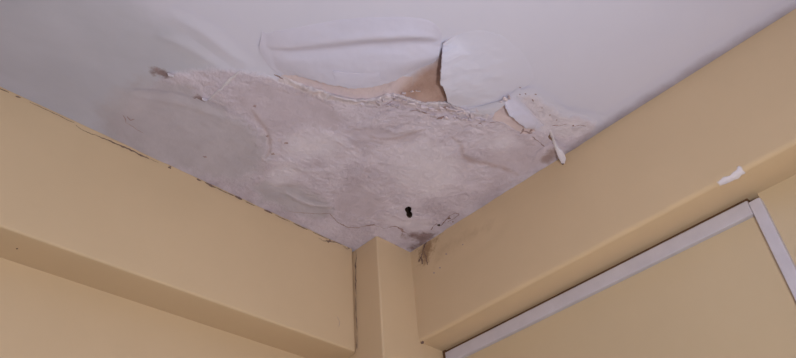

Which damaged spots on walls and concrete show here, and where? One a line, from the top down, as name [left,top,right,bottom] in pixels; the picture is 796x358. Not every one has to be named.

peeling [140,59,238,85]
flaking render [277,74,534,136]
leakage [0,0,567,286]
crack [197,179,430,239]
flaking render [291,220,405,250]